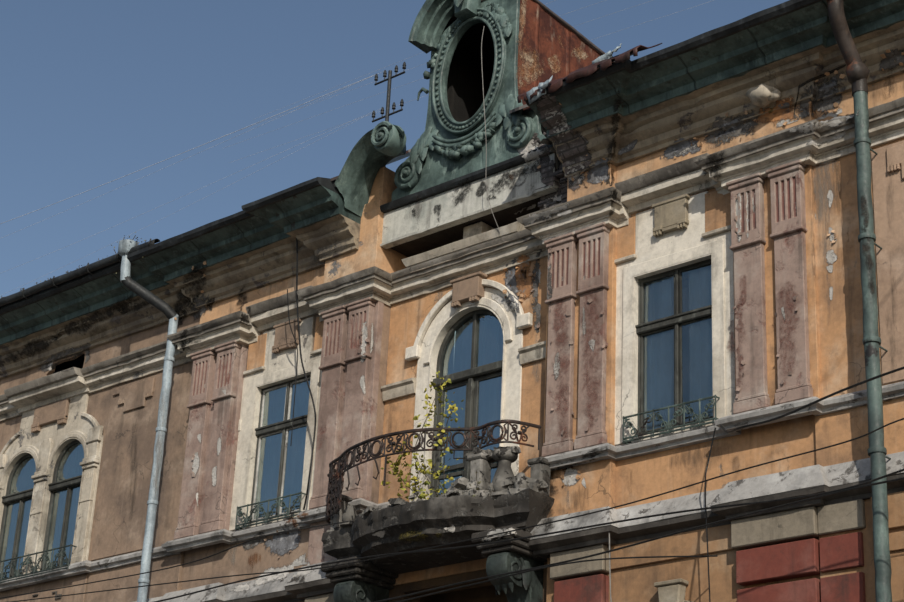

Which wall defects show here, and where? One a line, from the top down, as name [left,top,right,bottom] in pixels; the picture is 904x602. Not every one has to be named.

flaking render [660,70,860,159]
flaking render [515,103,638,226]
spalling [173,262,215,352]
flaking render [491,246,574,437]
peeling [727,291,746,376]
flaking render [230,524,311,592]